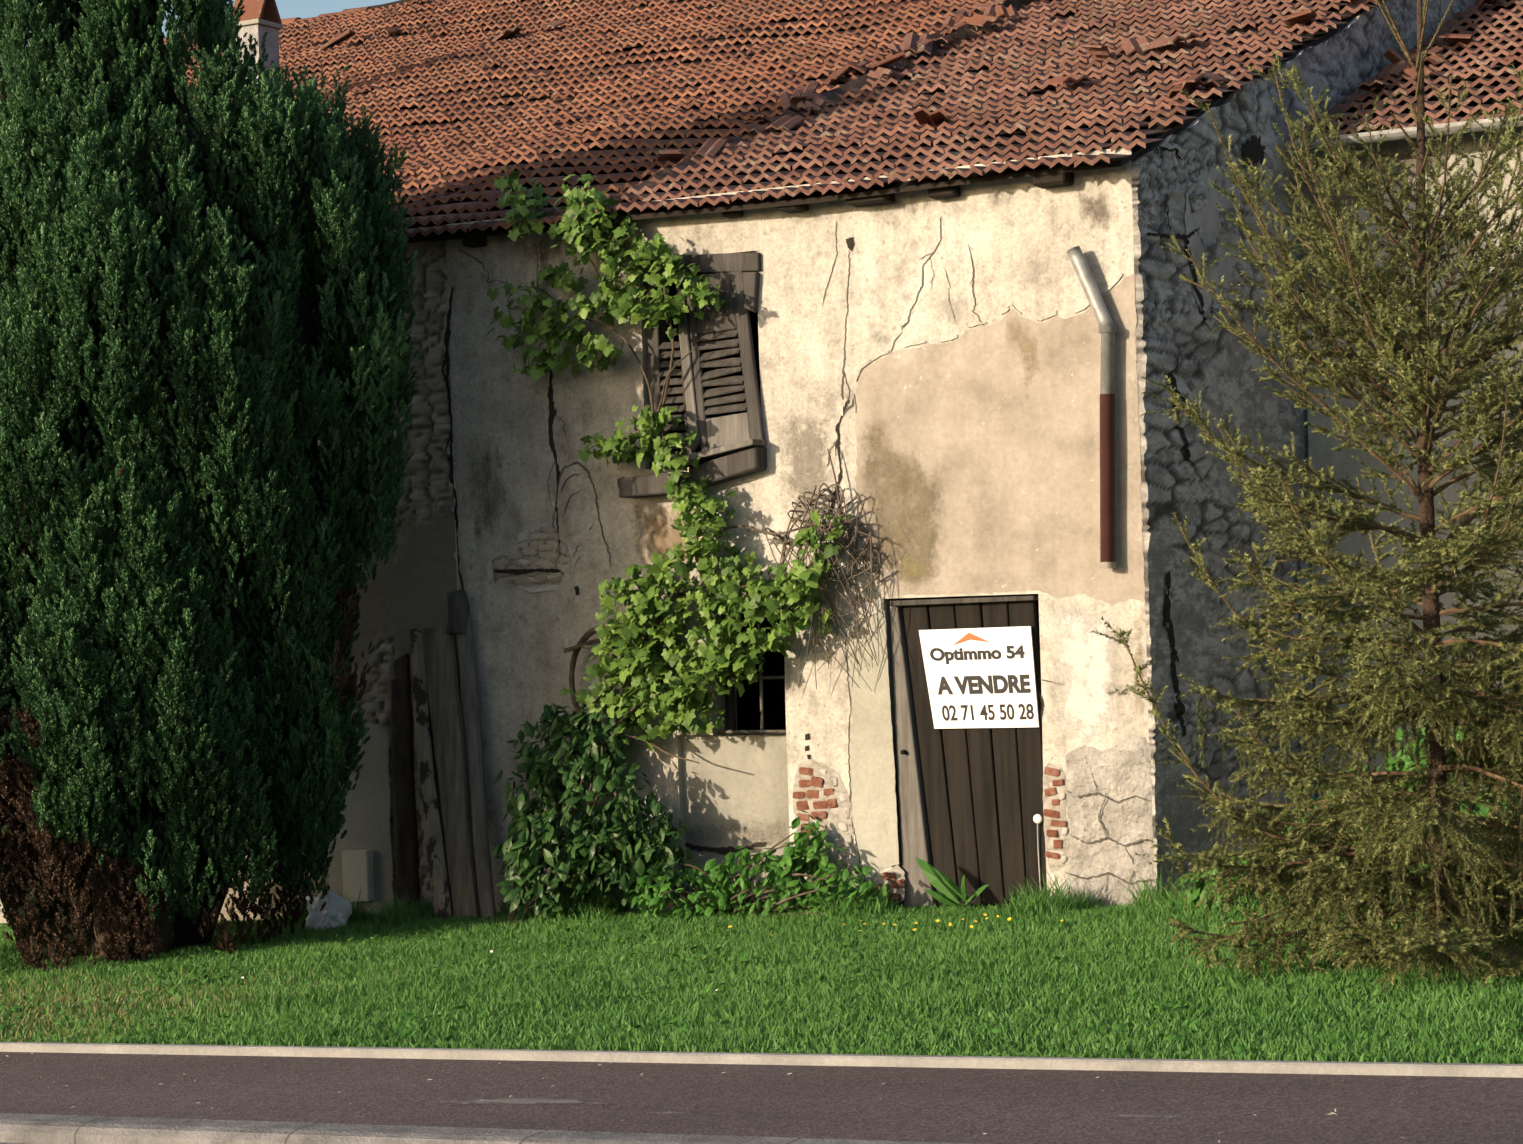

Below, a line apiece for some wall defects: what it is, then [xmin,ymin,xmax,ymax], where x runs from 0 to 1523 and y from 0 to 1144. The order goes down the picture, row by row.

crack [890,216,984,353]
crack [442,244,556,590]
crack [546,370,567,555]
crack [822,222,854,531]
flaking render [853,273,1146,606]
spalling [486,527,581,595]
crack [1163,571,1188,736]
spalling [793,733,860,876]
spalling [876,864,906,906]
spalling [1043,736,1158,908]